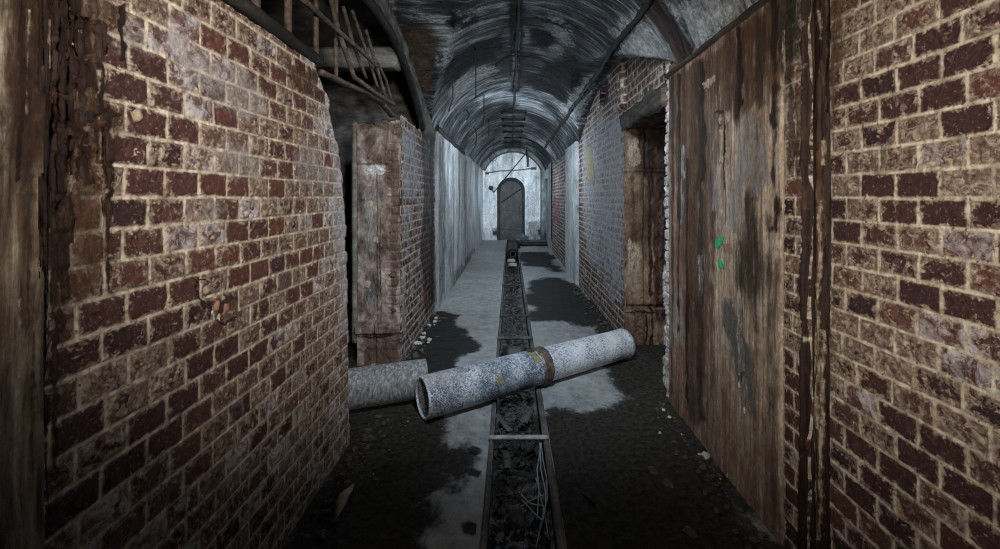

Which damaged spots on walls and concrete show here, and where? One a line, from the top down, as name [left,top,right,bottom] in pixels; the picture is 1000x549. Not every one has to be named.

water stain [403,24,497,104]
water stain [526,81,566,101]
spalling [203,285,238,321]
water stain [403,133,481,374]
water stain [519,252,614,334]
water stain [545,0,800,549]